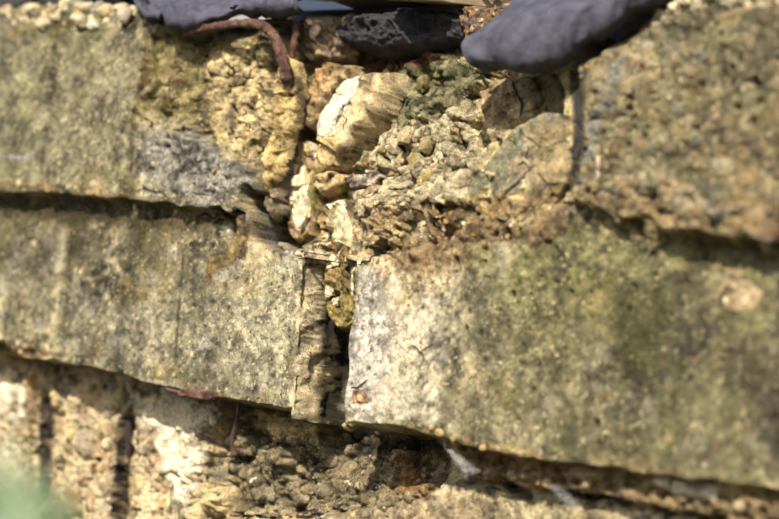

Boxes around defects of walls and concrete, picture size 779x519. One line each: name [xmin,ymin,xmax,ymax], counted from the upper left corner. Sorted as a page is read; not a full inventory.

corrosion [176,18,300,81]
crack [570,81,585,161]
spalling [138,37,279,273]
spalling [365,54,572,271]
crack [298,257,371,265]
spalling [352,389,370,403]
spalling [230,420,387,511]
crack [489,484,518,493]
crack [549,488,636,506]